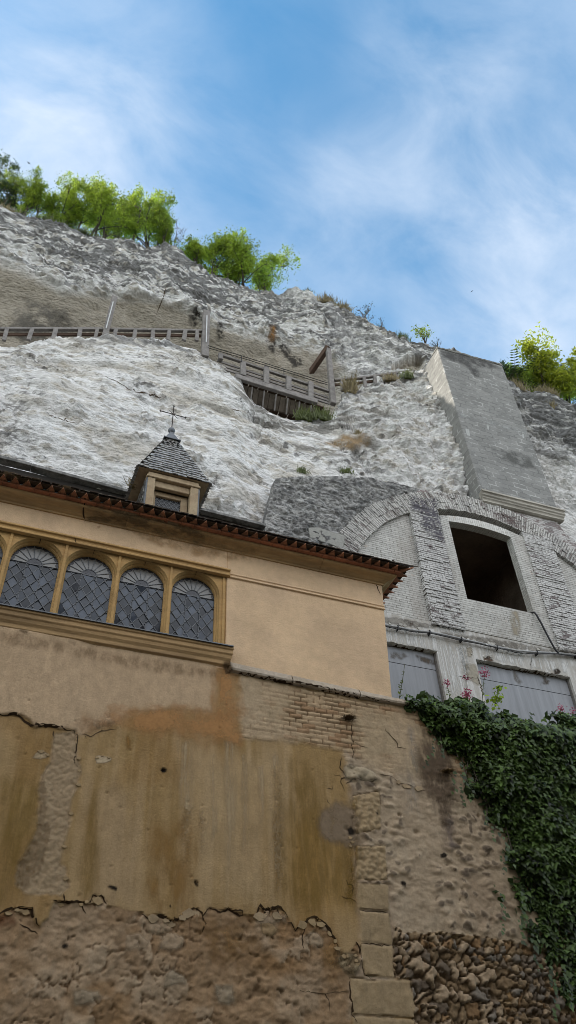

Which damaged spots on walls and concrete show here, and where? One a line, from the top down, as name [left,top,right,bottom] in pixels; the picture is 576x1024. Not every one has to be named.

crack [0,712,112,764]
flaking render [16,731,81,895]
water stain [312,803,359,898]
water stain [410,732,454,845]
flaking render [148,923,184,950]